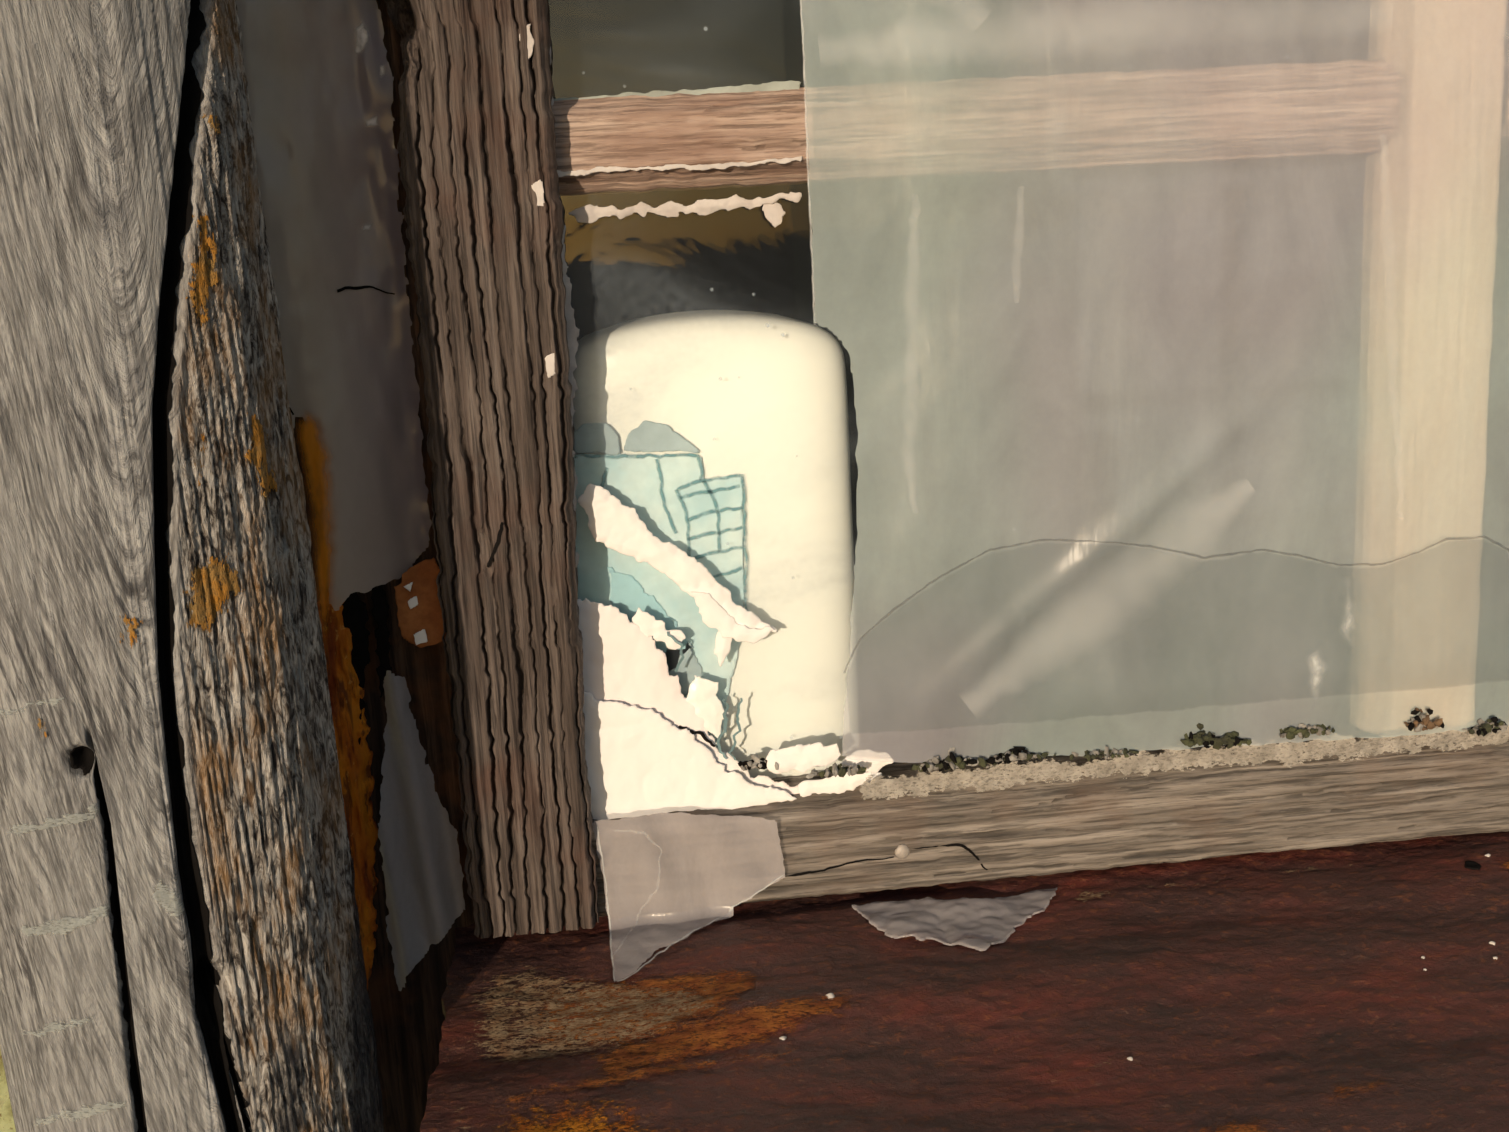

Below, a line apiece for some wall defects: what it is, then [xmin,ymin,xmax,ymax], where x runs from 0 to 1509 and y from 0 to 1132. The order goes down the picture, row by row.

peeling [519,24,552,65]
peeling [531,156,802,206]
peeling [545,192,802,426]
crack [152,0,251,1132]
peeling [301,417,446,745]
crack [94,759,147,1132]
corrosion [498,969,862,1132]
crack [783,843,988,877]